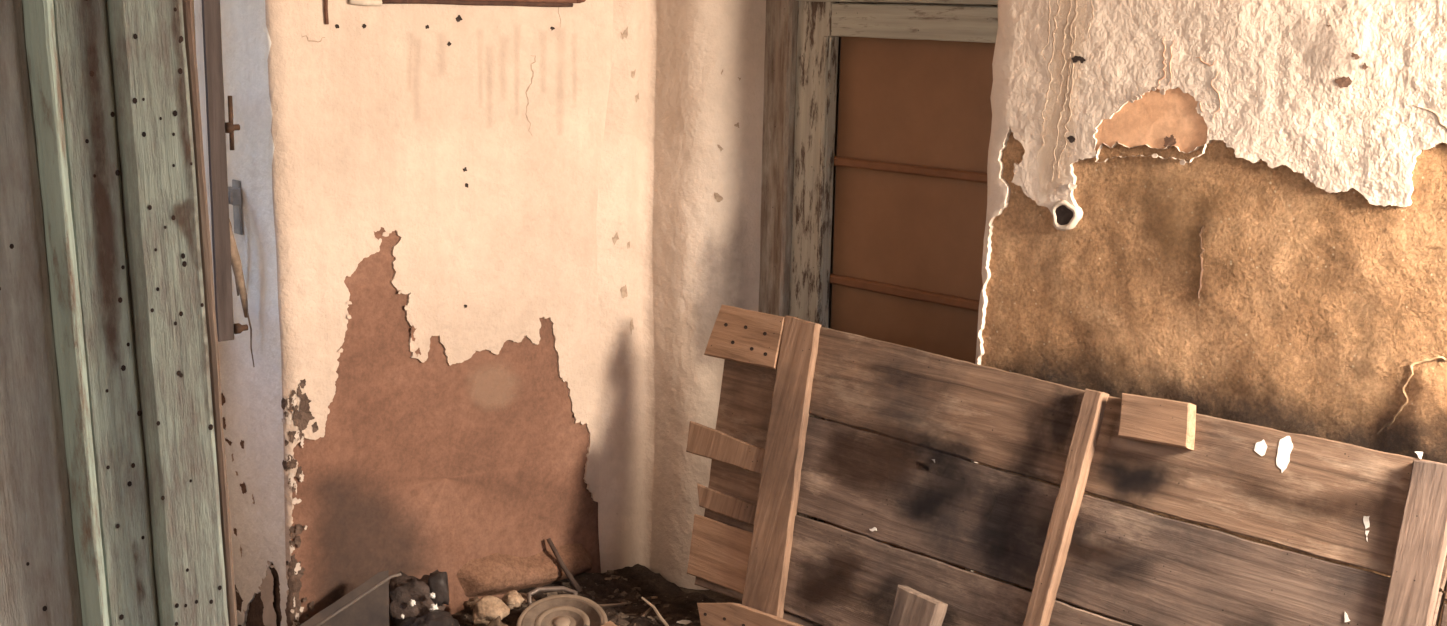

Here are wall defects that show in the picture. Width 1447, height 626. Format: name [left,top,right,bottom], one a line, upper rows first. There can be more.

crack [525,55,536,135]
crack [1036,0,1094,182]
flaking render [981,87,1447,438]
flaking render [221,393,255,504]
flaking render [235,227,601,626]
flaking render [1084,492,1391,578]